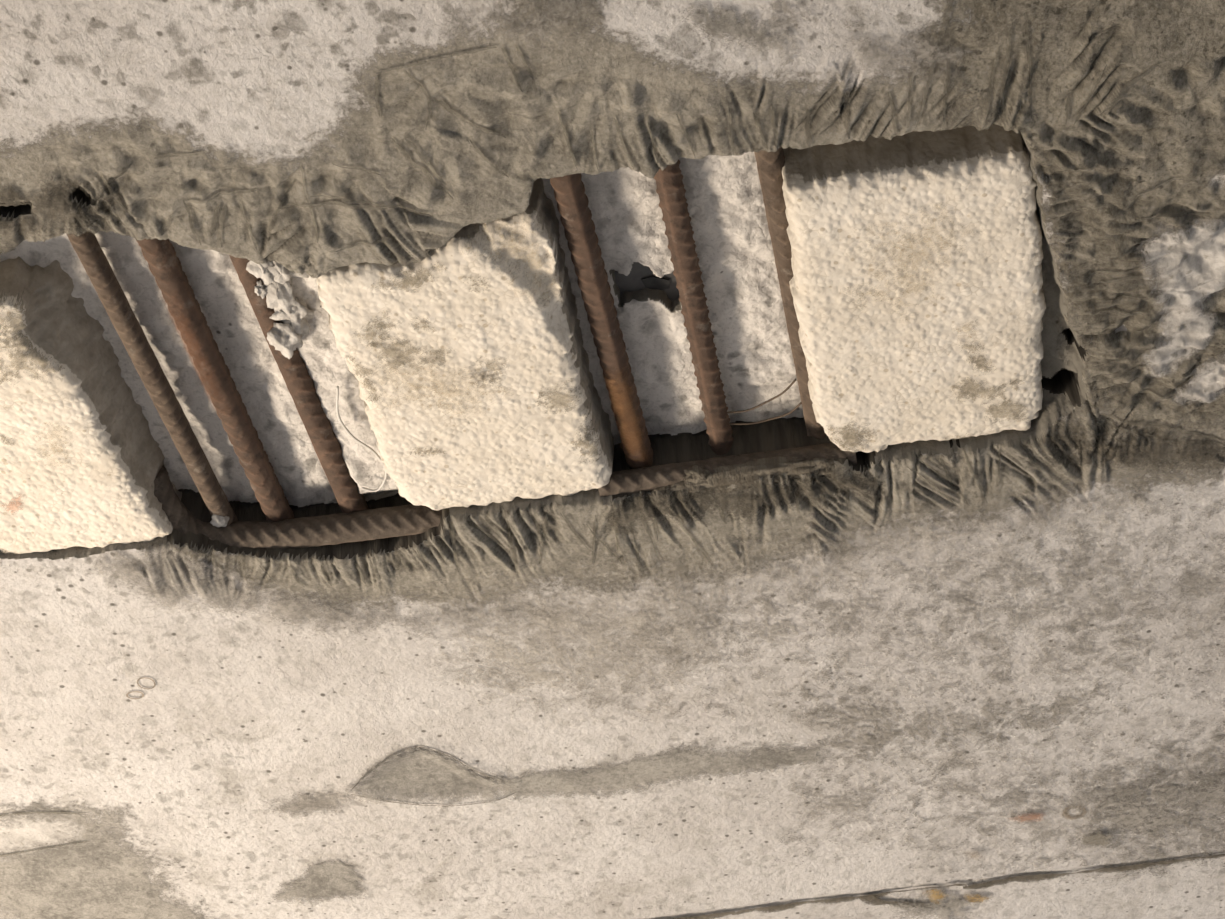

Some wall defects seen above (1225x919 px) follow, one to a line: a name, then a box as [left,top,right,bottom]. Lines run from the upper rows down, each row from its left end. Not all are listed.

peeling [0,0,1225,612]
rust [603,371,647,461]
leakage [442,463,1225,895]
leakage [269,792,348,817]
leakage [0,795,215,919]
leakage [274,861,365,904]
crack [674,854,1225,919]